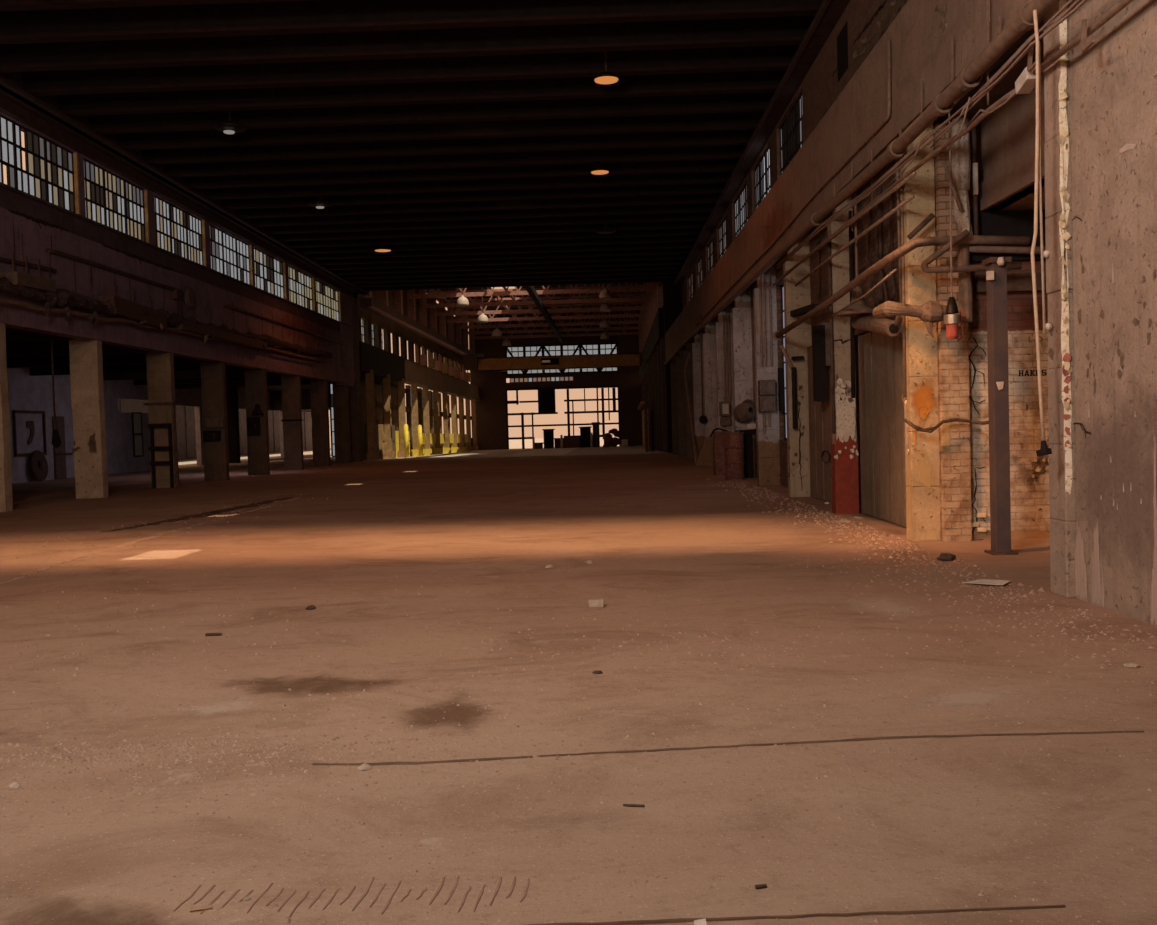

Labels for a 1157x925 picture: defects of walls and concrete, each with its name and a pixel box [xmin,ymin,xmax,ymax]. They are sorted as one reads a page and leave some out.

peeling [1048,0,1084,494]
peeling [834,374,859,459]
corrosion [912,384,935,446]
spalling [1029,436,1049,485]
leakage [1075,434,1157,627]